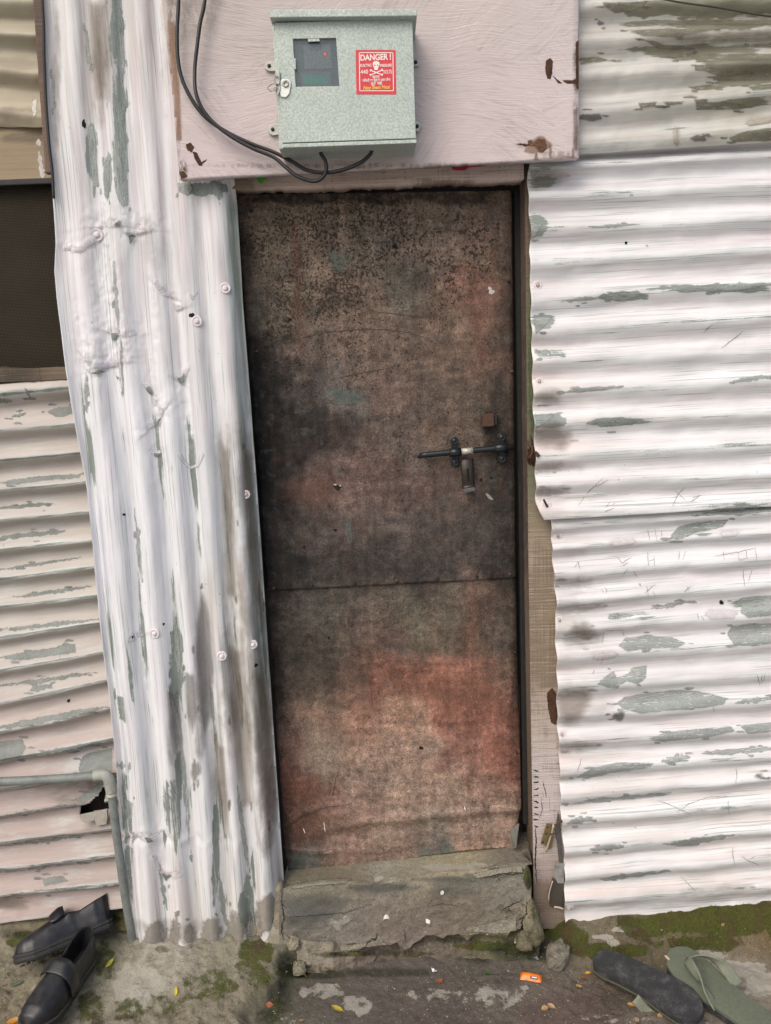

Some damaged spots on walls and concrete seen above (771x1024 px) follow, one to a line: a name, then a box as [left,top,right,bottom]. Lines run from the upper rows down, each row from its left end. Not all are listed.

rust [545,34,579,89]
peeling [597,1,771,113]
rust [169,22,207,166]
peeling [88,100,131,211]
rust [517,136,552,159]
rust [527,437,536,466]
peeling [598,666,771,713]
peeling [651,723,771,757]
peeling [569,752,690,781]
peeling [562,793,666,828]
peeling [0,793,154,899]
peeling [664,834,734,846]